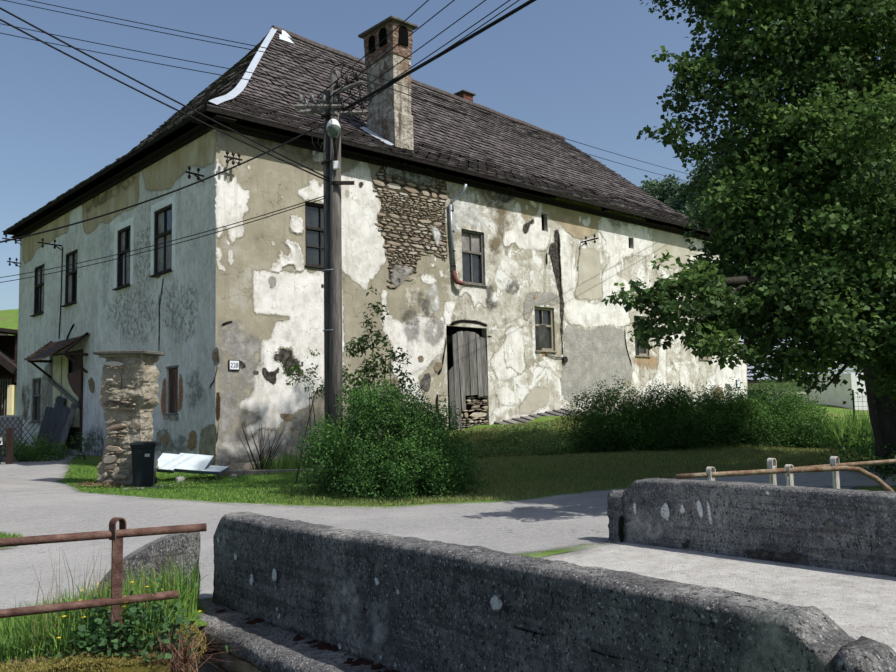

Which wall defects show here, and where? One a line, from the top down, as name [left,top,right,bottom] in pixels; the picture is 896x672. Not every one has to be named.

peeling [22,212,70,264]
peeling [82,131,252,272]
peeling [297,178,324,203]
spalling [211,347,220,368]
peeling [239,214,324,437]
flaking render [341,161,488,403]
peeling [490,185,690,417]
spalling [155,375,183,453]
spalling [188,392,221,465]